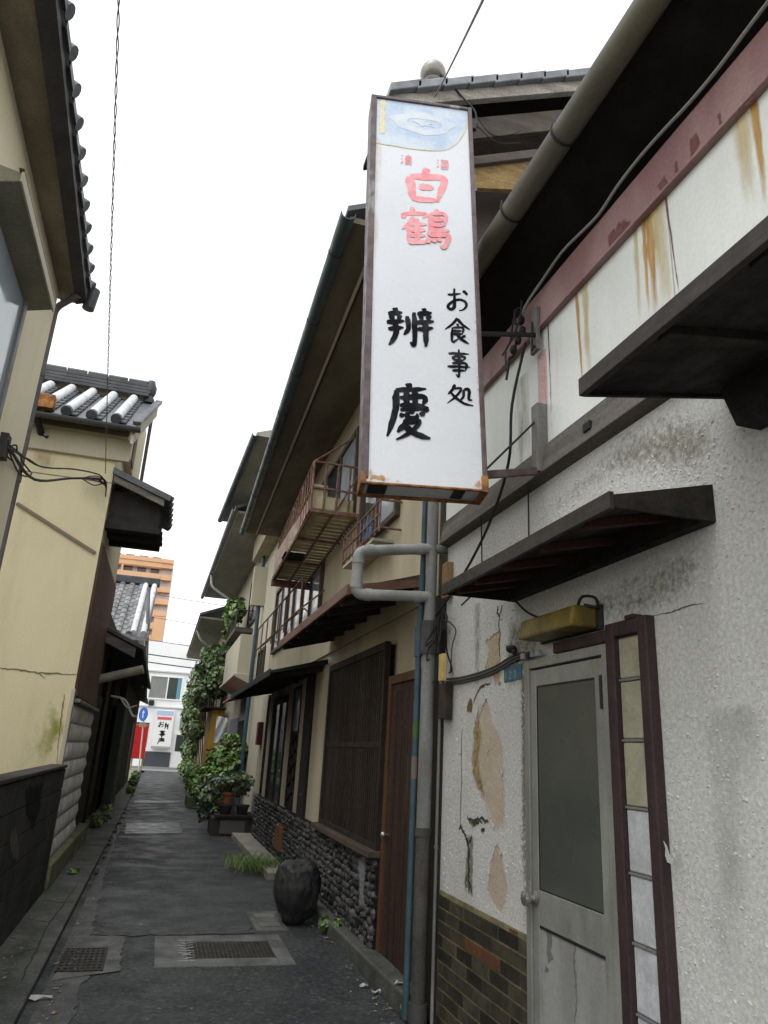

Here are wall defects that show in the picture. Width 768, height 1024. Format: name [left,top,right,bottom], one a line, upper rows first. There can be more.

corrosion [737,101,764,177]
corrosion [634,197,678,296]
corrosion [575,284,588,372]
peeling [485,632,501,685]
crack [1,668,78,759]
peeling [472,698,503,832]
peeling [487,846,508,913]